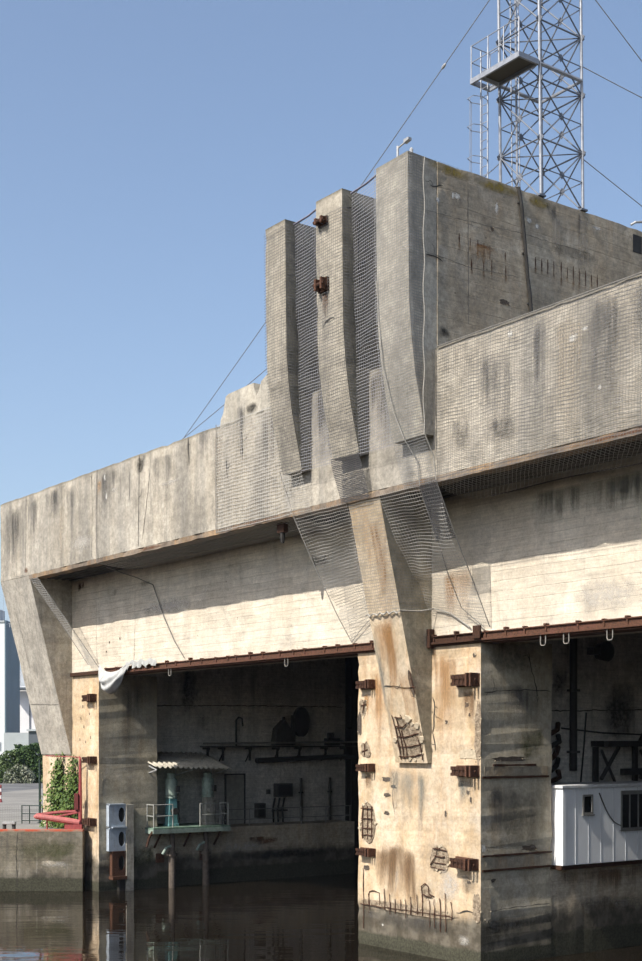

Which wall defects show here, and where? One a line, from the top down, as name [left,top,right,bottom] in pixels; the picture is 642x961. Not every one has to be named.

spalling [391,715,424,762]
spalling [358,800,377,843]
spalling [430,844,449,873]
spalling [359,865,456,932]